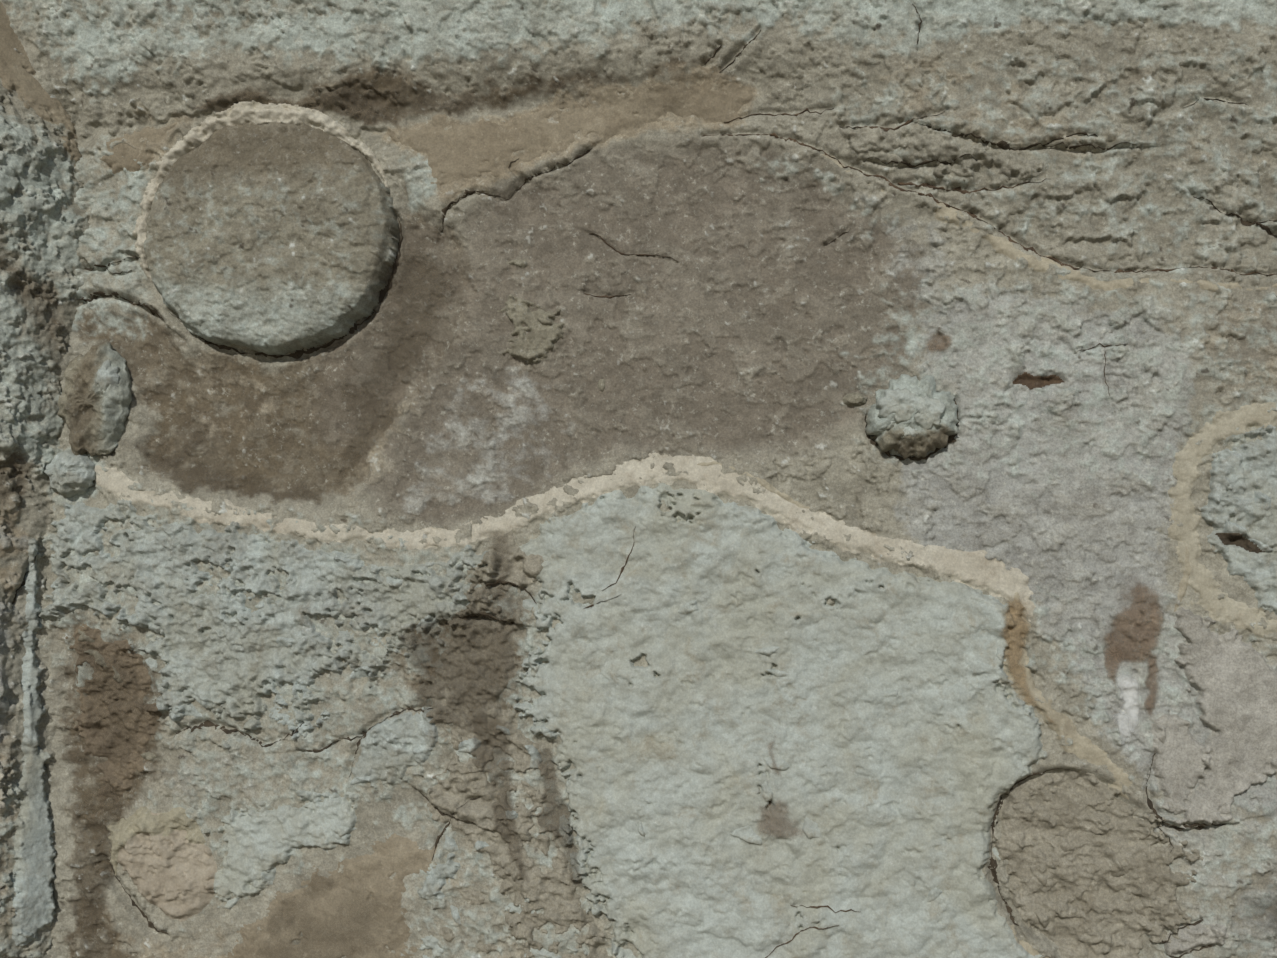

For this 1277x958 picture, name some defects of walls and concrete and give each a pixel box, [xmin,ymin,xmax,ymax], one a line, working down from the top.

peeling [846,122,1044,182]
crack [441,149,591,231]
crack [703,108,1277,276]
crack [589,233,675,260]
peeling [496,294,565,365]
crack [584,292,630,300]
peeling [842,387,946,438]
spalling [1013,372,1064,389]
peeling [1201,425,1277,616]
crack [174,707,432,777]
peeling [0,483,1277,958]
crack [421,793,479,860]